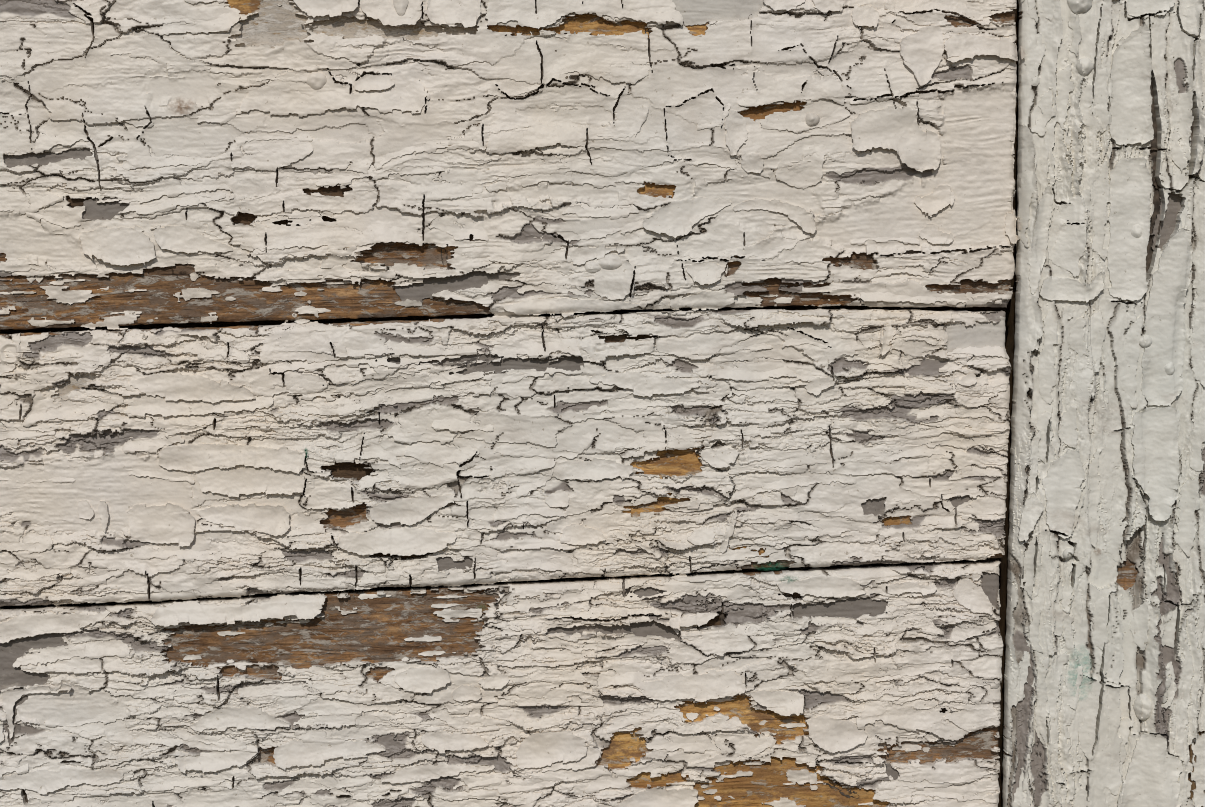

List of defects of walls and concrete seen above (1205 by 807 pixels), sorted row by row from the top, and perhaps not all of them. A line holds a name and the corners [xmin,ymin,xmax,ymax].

peeling [197,64,430,171]
crack [327,69,392,94]
peeling [110,0,903,84]
peeling [485,84,542,97]
crack [496,0,625,165]
crack [663,63,757,161]
peeling [697,8,1056,172]
crack [782,40,993,124]
crack [1112,82,1203,274]
crack [840,245,1007,260]
peeling [854,0,1205,599]
peeling [0,113,1053,807]